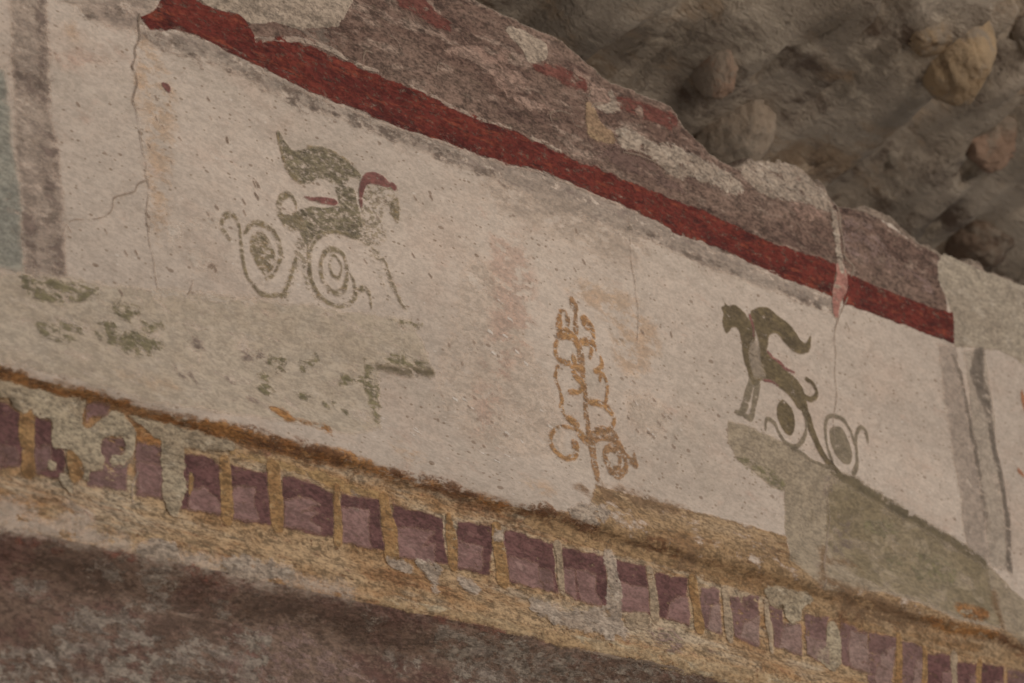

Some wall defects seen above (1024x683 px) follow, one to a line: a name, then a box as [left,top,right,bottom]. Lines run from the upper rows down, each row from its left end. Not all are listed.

crack [132,14,143,148]
peeling [444,26,556,115]
peeling [573,67,833,221]
crack [63,178,157,281]
crack [832,206,854,439]